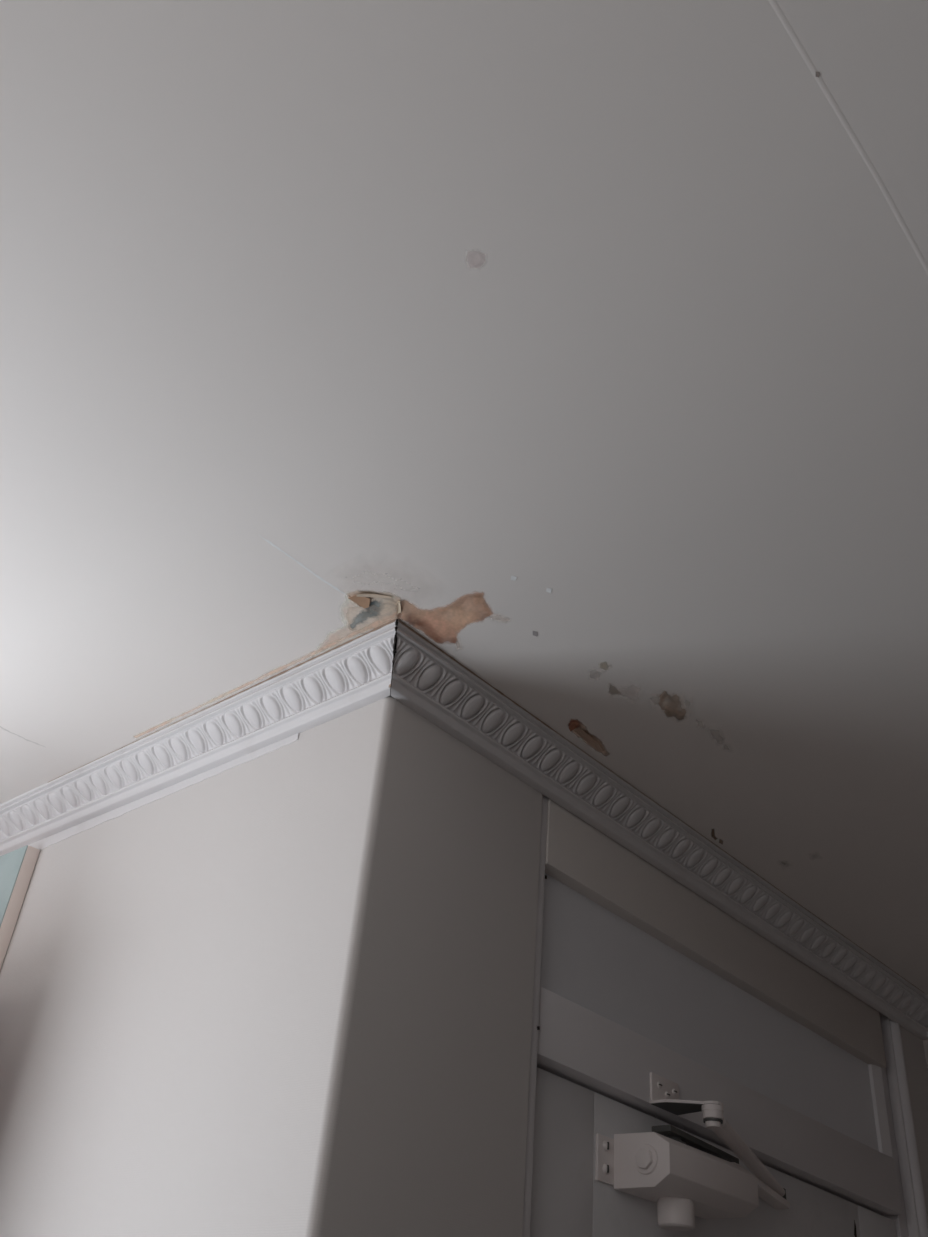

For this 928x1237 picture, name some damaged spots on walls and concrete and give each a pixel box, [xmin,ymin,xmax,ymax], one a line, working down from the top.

peeling [346,591,401,633]
peeling [568,719,609,756]